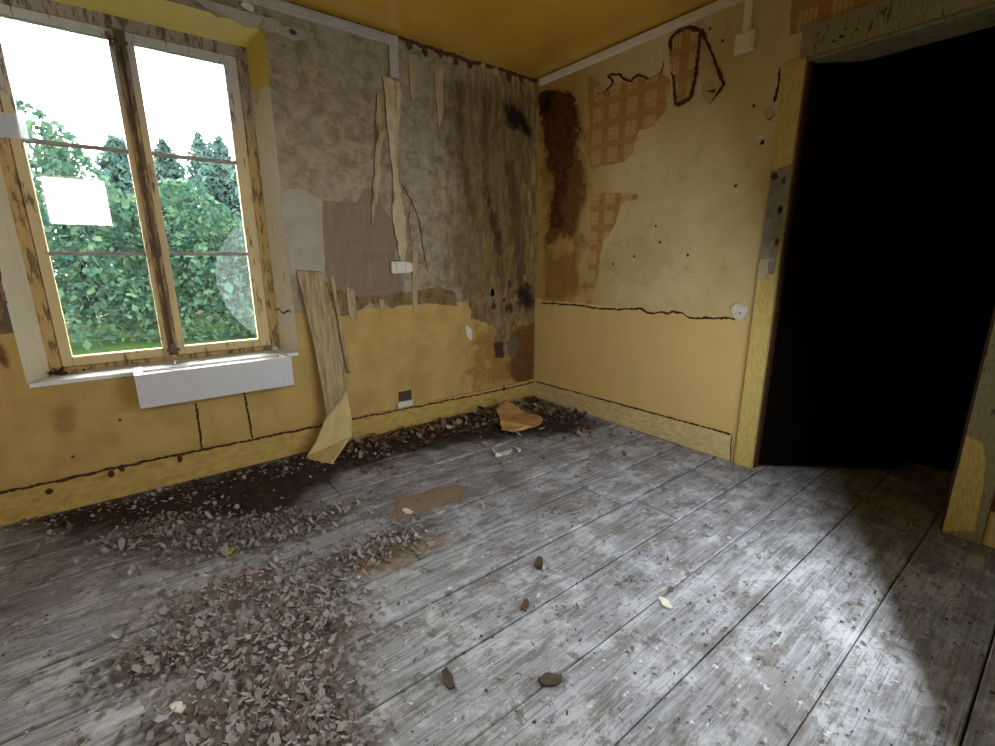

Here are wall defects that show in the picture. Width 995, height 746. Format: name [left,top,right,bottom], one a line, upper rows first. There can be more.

crack [282,0,537,83]
leakage [505,104,531,136]
leakage [536,90,587,245]
peeling [757,163,792,279]
flaking render [322,187,535,359]
leakage [517,287,534,307]
crack [541,302,745,320]
crack [0,393,323,495]
crack [352,381,732,461]